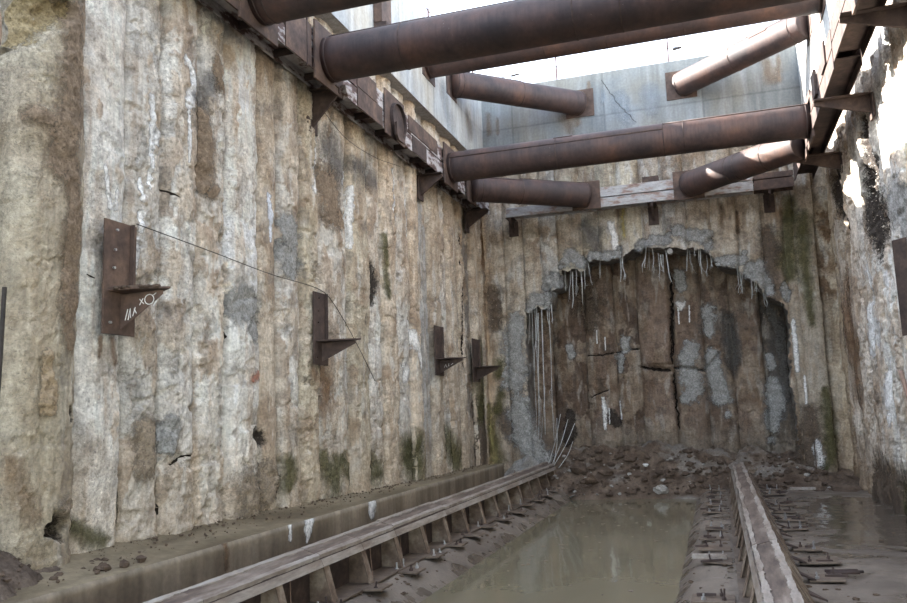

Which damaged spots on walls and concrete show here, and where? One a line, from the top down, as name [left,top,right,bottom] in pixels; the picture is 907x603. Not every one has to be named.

spalling [635,224,791,307]
spalling [486,246,626,476]
spalling [615,334,631,374]
crack [588,273,705,429]
spalling [676,304,734,419]
spalling [763,352,787,445]